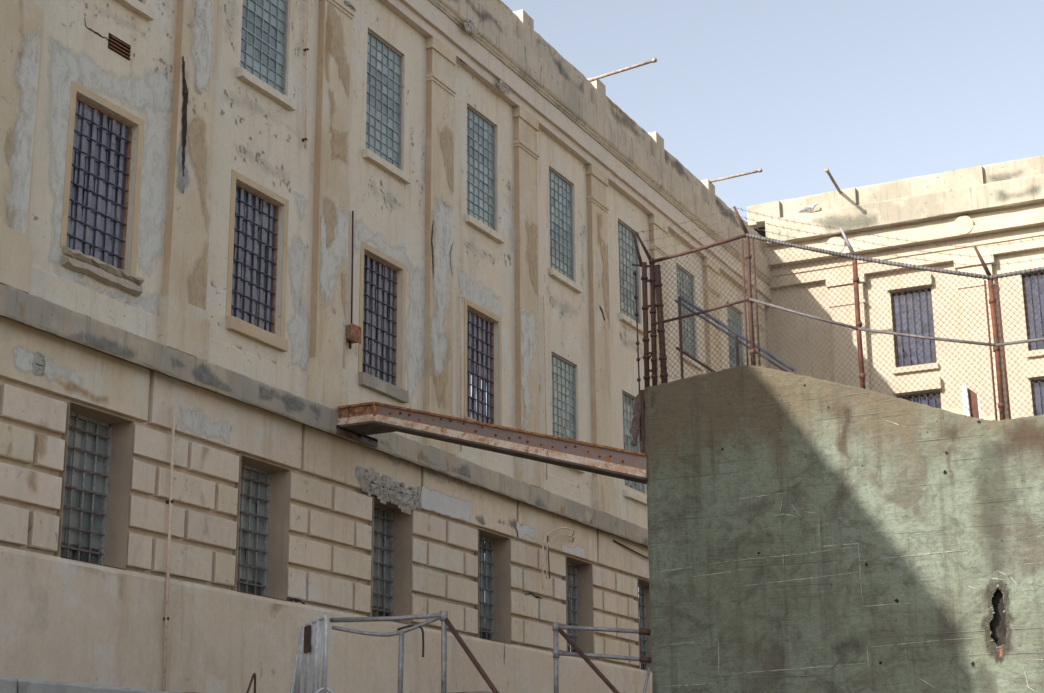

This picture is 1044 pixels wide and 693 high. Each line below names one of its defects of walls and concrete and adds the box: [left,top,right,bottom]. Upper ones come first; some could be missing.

peeling [6,32,189,317]
crack [181,56,189,193]
spalling [356,466,422,515]
peeling [429,468,475,486]